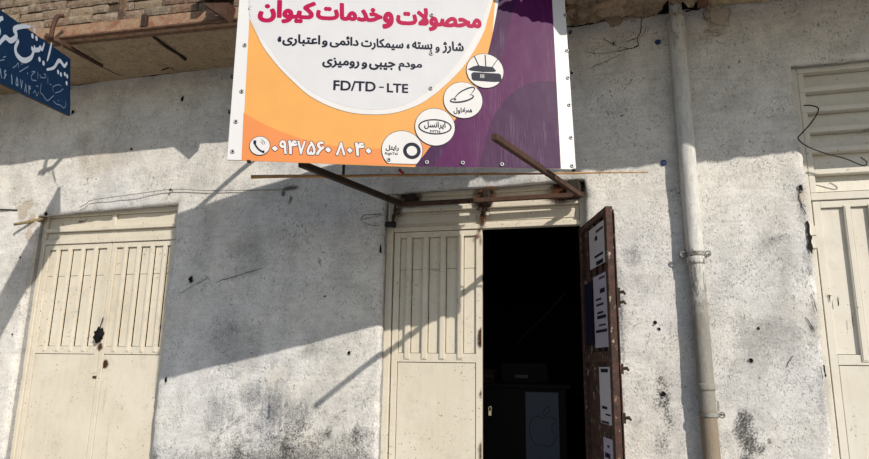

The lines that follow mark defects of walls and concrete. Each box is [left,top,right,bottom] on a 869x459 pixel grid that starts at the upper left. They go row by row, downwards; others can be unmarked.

crack [567,9,699,69]
rust [550,184,573,203]
water stain [733,410,771,459]